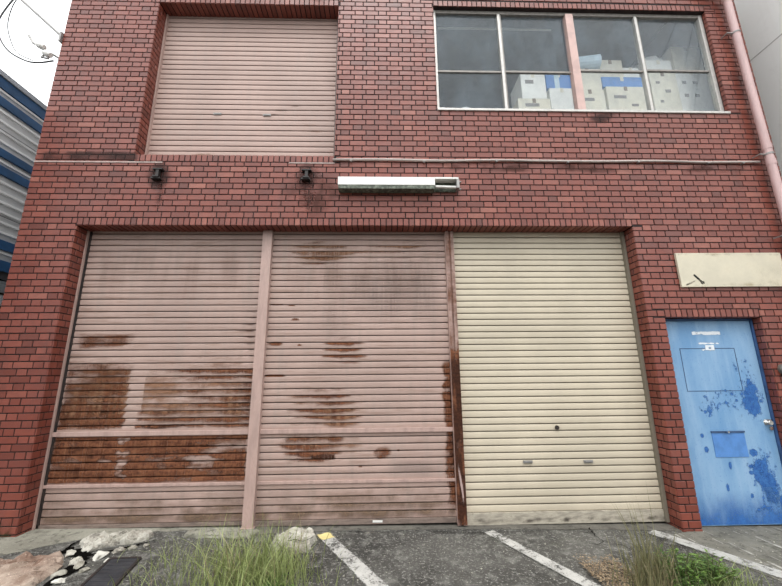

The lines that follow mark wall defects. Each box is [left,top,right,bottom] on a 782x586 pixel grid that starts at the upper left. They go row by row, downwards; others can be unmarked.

rust [293,242,421,264]
rust [81,335,133,348]
rust [323,342,365,362]
peeling [701,361,764,417]
rust [47,362,253,484]
rust [294,395,358,427]
rust [442,335,468,525]
rust [282,437,355,462]
peeling [749,449,782,512]